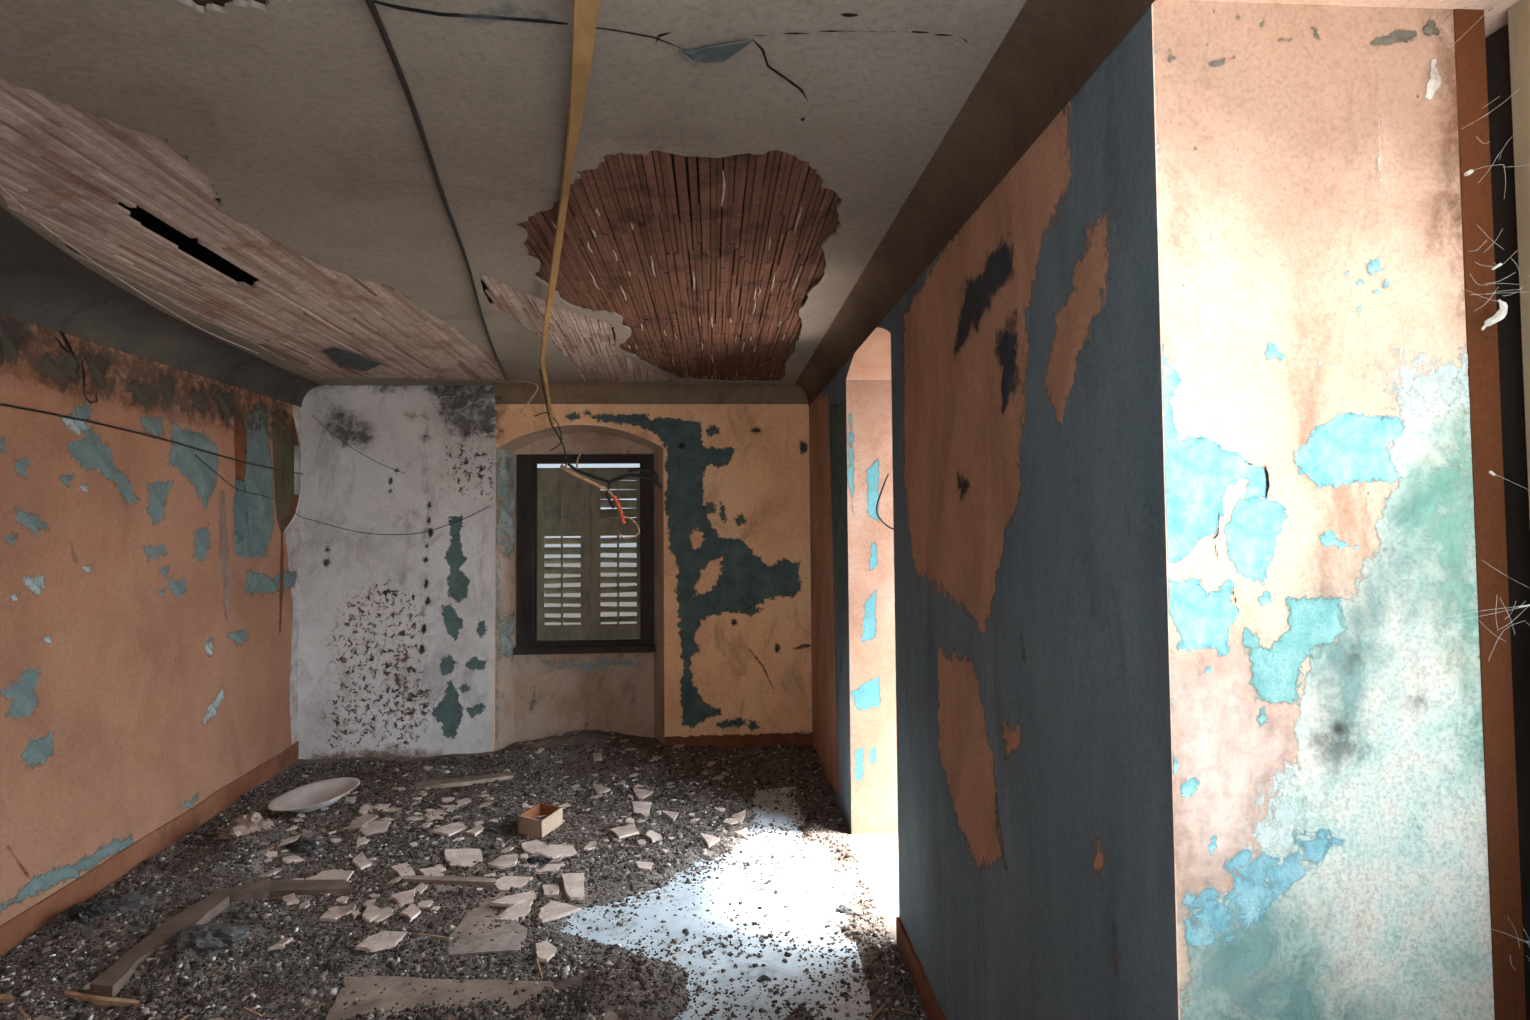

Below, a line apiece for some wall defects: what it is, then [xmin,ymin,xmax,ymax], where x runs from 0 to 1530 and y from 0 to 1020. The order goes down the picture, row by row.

crack [373,0,685,50]
crack [752,13,968,121]
damp [0,313,288,439]
peeling [233,400,302,745]
damp [321,580,430,748]
damp [423,444,495,562]
peeling [432,514,514,739]
peeling [566,394,881,796]
peeling [902,101,1110,634]
peeling [1162,341,1347,726]
damp [1179,346,1495,1020]
peeling [1293,412,1406,489]